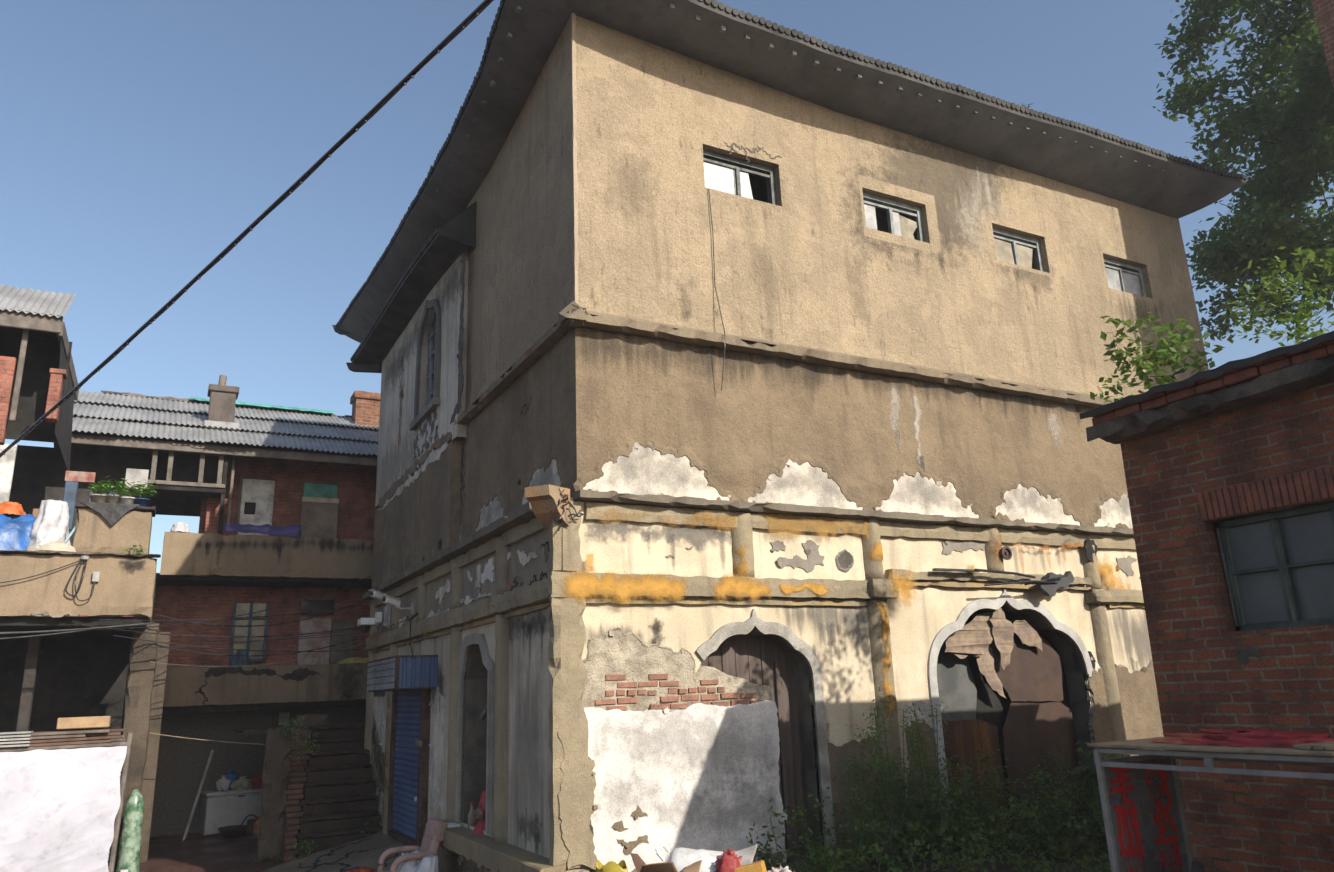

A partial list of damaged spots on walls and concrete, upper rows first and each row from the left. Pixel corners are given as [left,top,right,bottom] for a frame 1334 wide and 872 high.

spalling [379,252,466,511]
flaking render [473,440,1133,563]
spalling [770,540,854,573]
spalling [1116,555,1140,578]
crack [297,839,398,872]